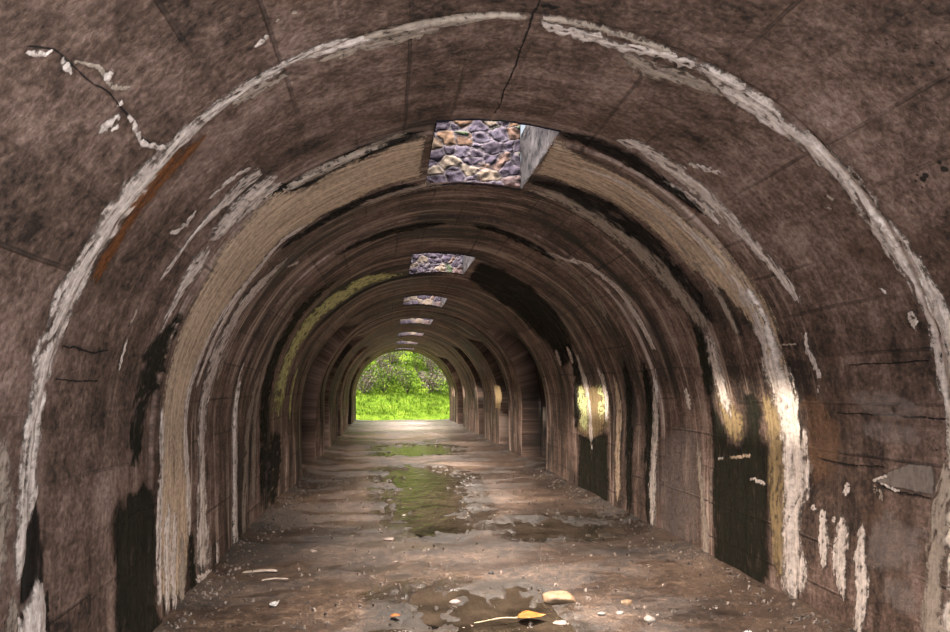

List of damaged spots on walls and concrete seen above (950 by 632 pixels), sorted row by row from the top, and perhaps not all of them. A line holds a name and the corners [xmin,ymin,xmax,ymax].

crack [26,45,166,150]
crack [494,0,560,113]
leakage [0,11,527,632]
leakage [473,225,656,350]
leakage [529,14,950,632]